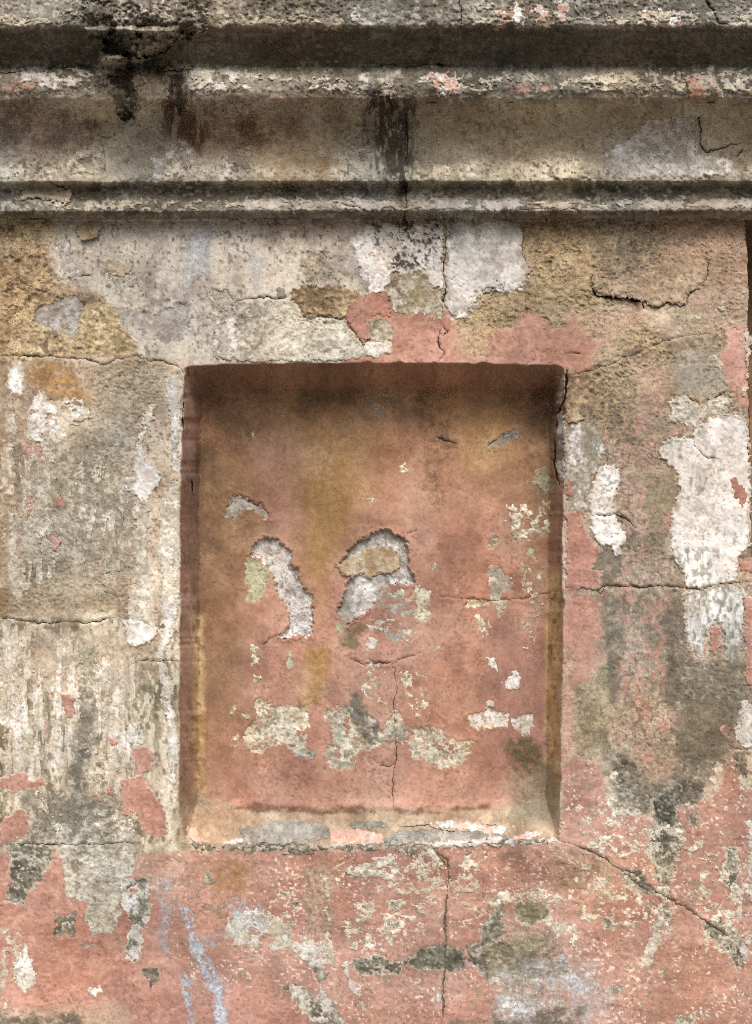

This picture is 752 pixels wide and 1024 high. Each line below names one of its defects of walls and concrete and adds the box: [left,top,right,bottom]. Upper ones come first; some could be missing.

water stain [161,70,209,150]
water stain [367,85,415,196]
peeling [0,141,752,364]
crack [592,262,709,309]
peeling [658,330,752,749]
peeling [0,361,183,988]
flaking render [229,529,534,771]
water stain [604,597,626,697]
crack [354,652,462,1022]
water stain [613,754,639,788]
crack [562,841,728,936]
water stain [654,776,704,820]